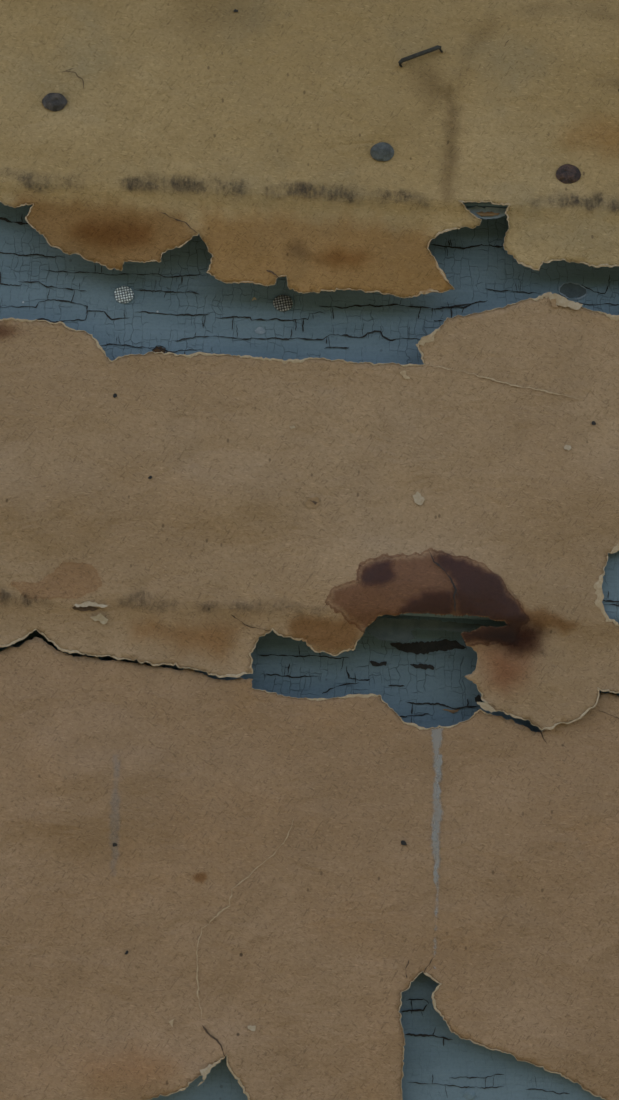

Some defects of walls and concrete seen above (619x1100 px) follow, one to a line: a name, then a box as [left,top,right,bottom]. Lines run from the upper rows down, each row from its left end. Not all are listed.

crack [0,217,28,225]
crack [430,233,503,256]
crack [0,252,539,354]
peeling [549,282,587,310]
crack [578,275,619,306]
peeling [390,639,466,670]
peeling [475,695,496,713]
damp [432,729,442,884]